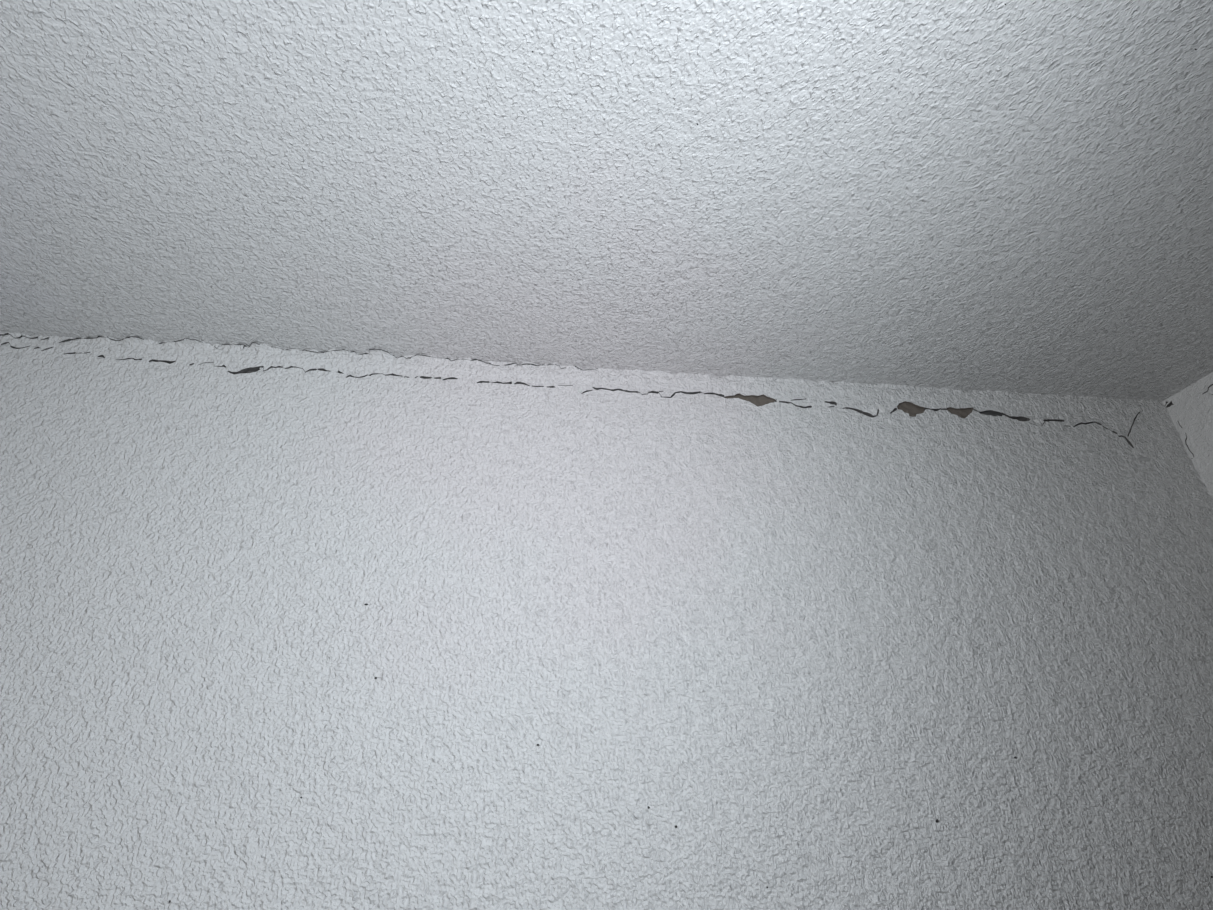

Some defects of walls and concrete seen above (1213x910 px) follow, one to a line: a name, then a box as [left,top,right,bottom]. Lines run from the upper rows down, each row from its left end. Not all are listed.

crack [0,333,724,398]
flaking render [724,393,775,406]
flaking render [897,401,925,417]
flaking render [947,407,1005,419]
crack [774,399,1194,459]